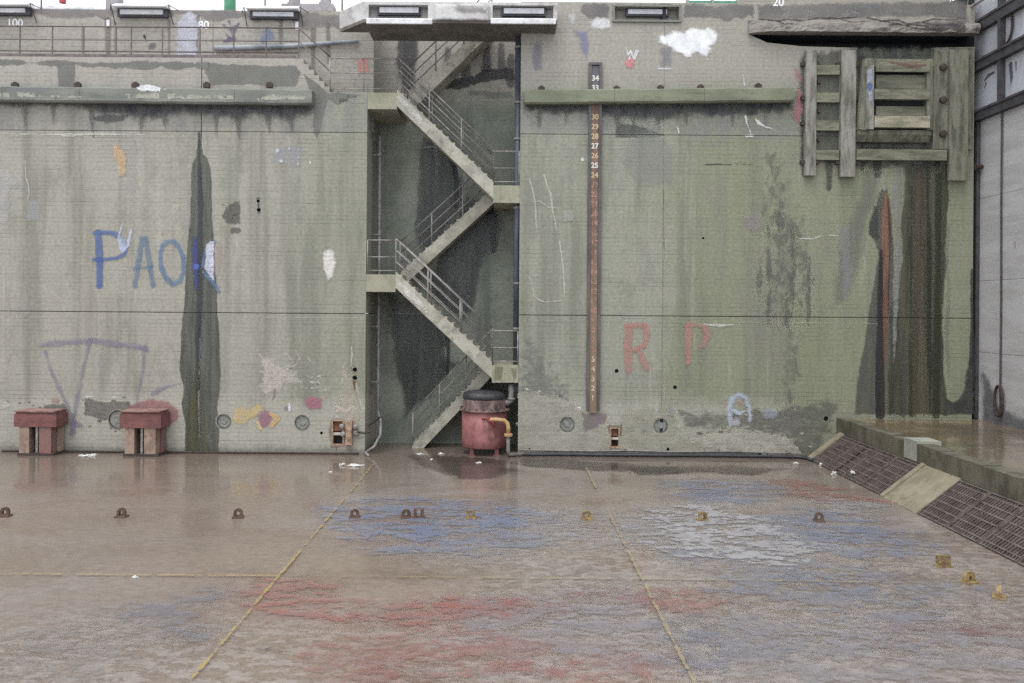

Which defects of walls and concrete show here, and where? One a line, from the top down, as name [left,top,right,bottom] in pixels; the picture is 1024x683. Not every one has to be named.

leakage [33,5,357,137]
leakage [528,105,588,119]
leakage [602,48,932,190]
leakage [180,133,221,451]
leakage [391,298,454,410]
rust [876,193,891,419]
leakage [855,138,1024,430]